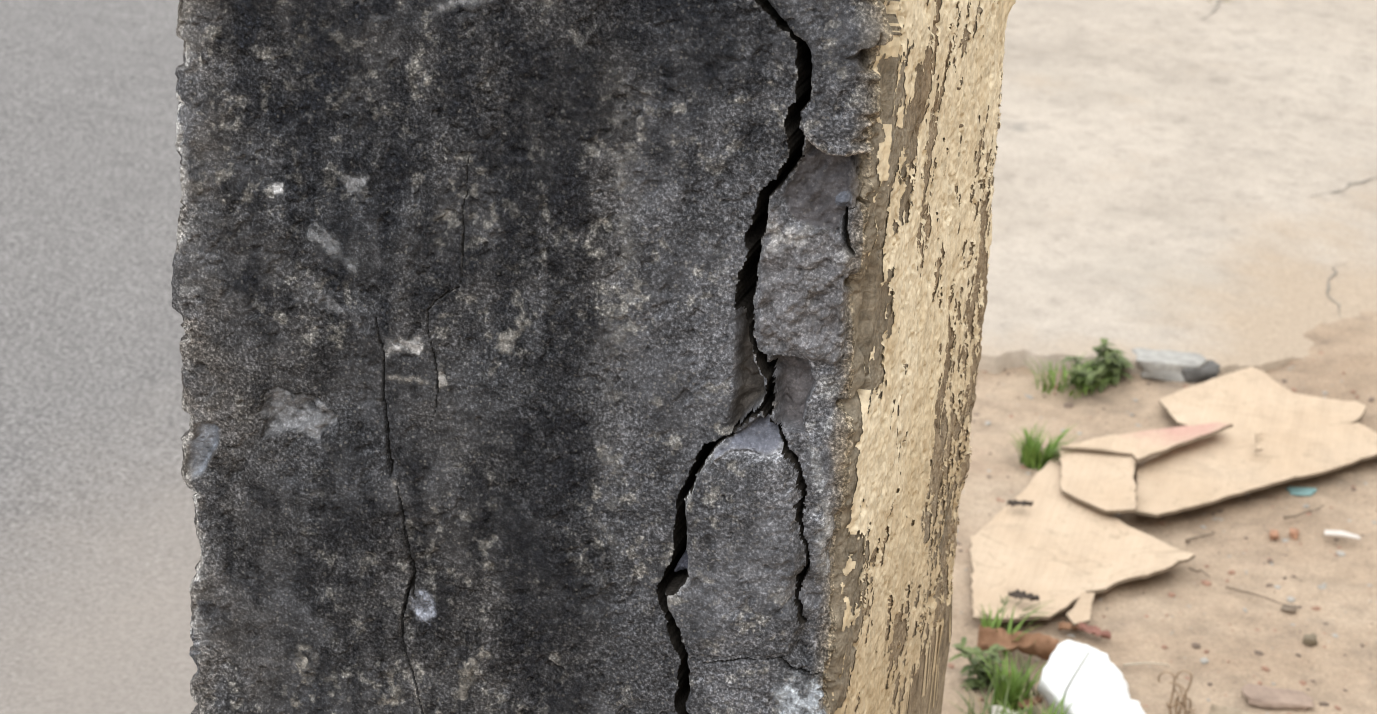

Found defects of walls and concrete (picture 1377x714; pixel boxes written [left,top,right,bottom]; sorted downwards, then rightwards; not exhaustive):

crack [656,0,832,714]
crack [845,179,871,256]
peeling [714,0,1016,714]